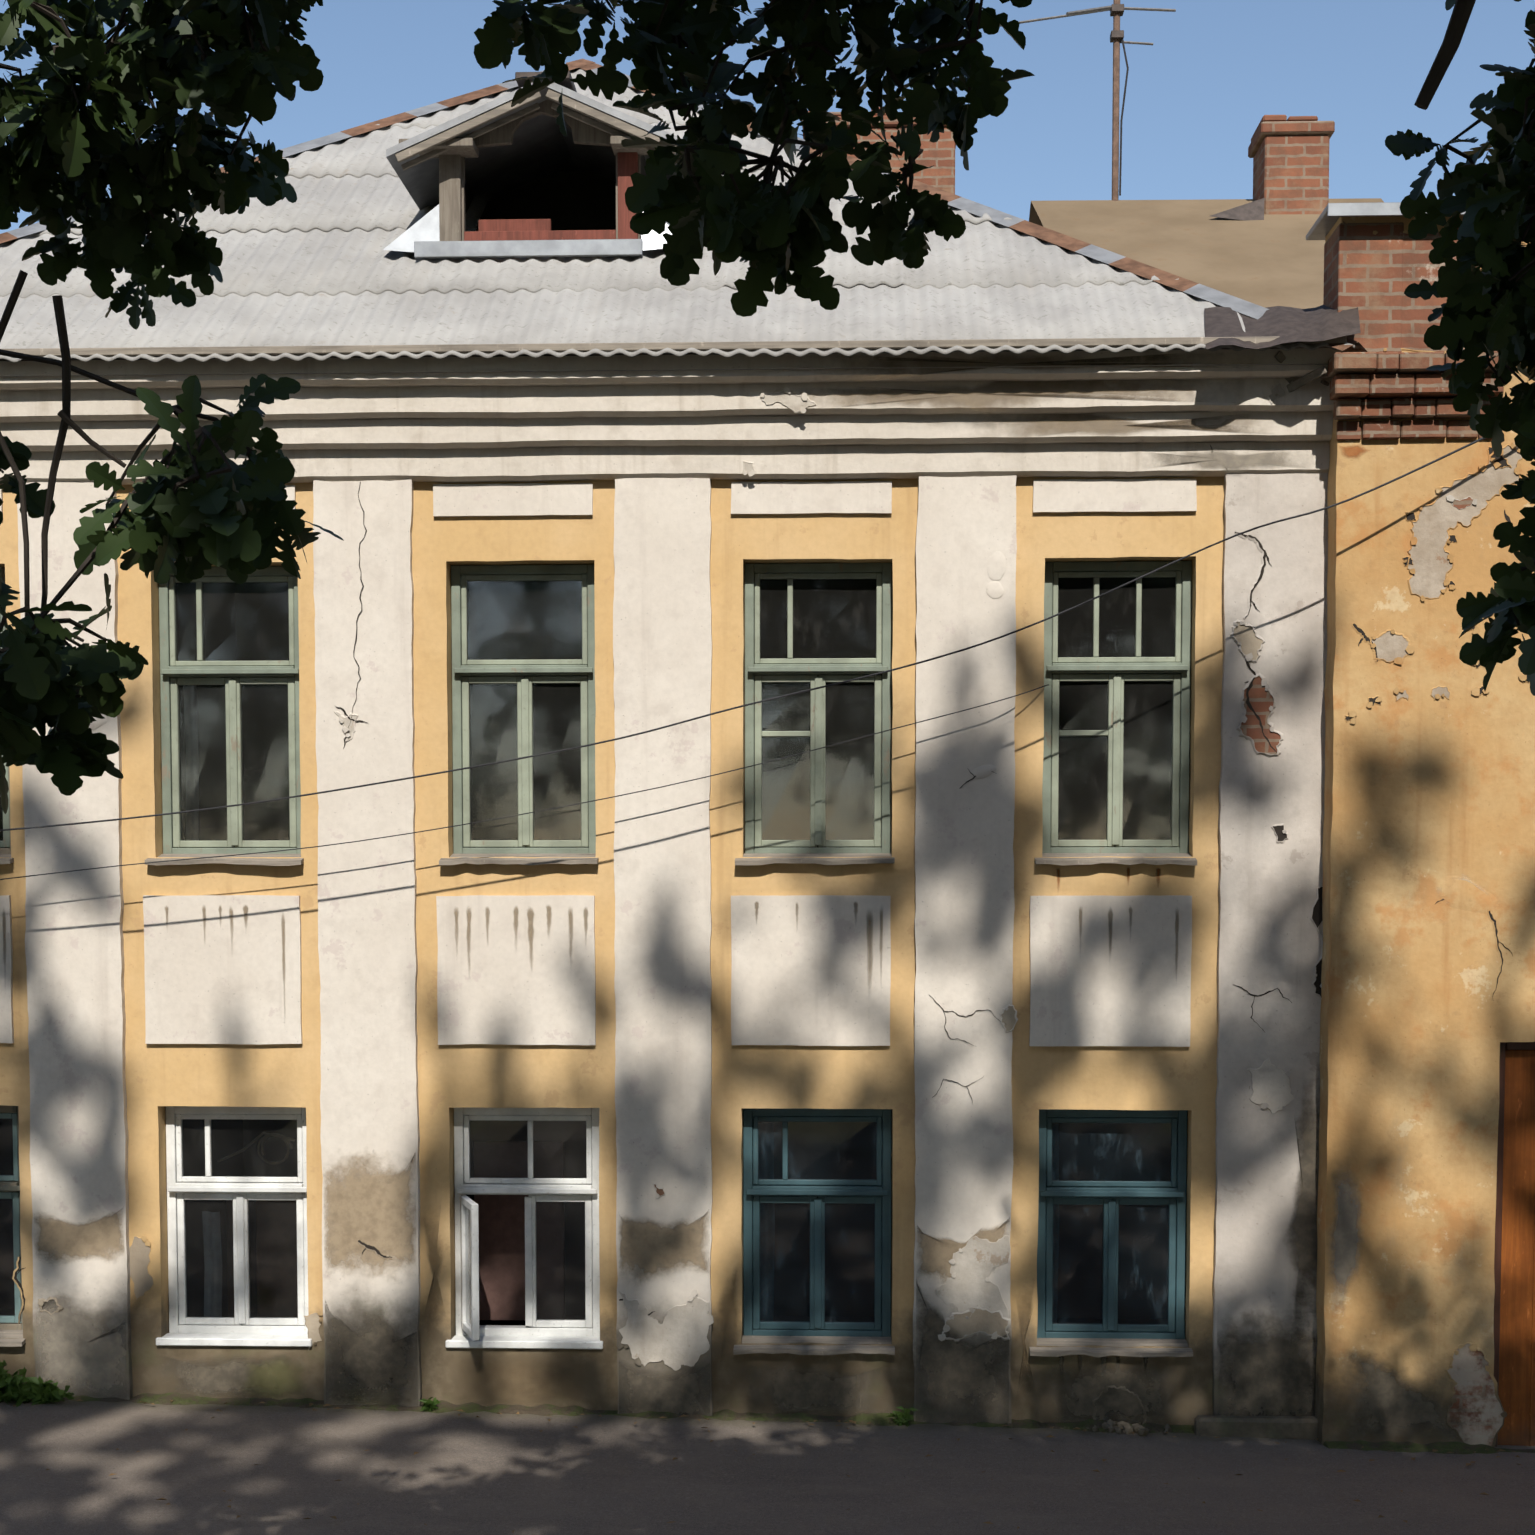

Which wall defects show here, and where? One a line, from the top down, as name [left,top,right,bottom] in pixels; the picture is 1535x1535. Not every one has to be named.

flaking render [1402,442,1523,601]
crack [337,482,367,749]
crack [1234,532,1272,619]
flaking render [1230,620,1284,757]
water stain [514,906,551,952]
crack [1487,909,1513,1001]
crack [929,995,1001,1104]
water stain [35,1213,123,1260]
water stain [36,1297,126,1396]
water stain [326,1157,441,1323]
peeling [616,1290,714,1371]
peeling [935,1235,1011,1342]